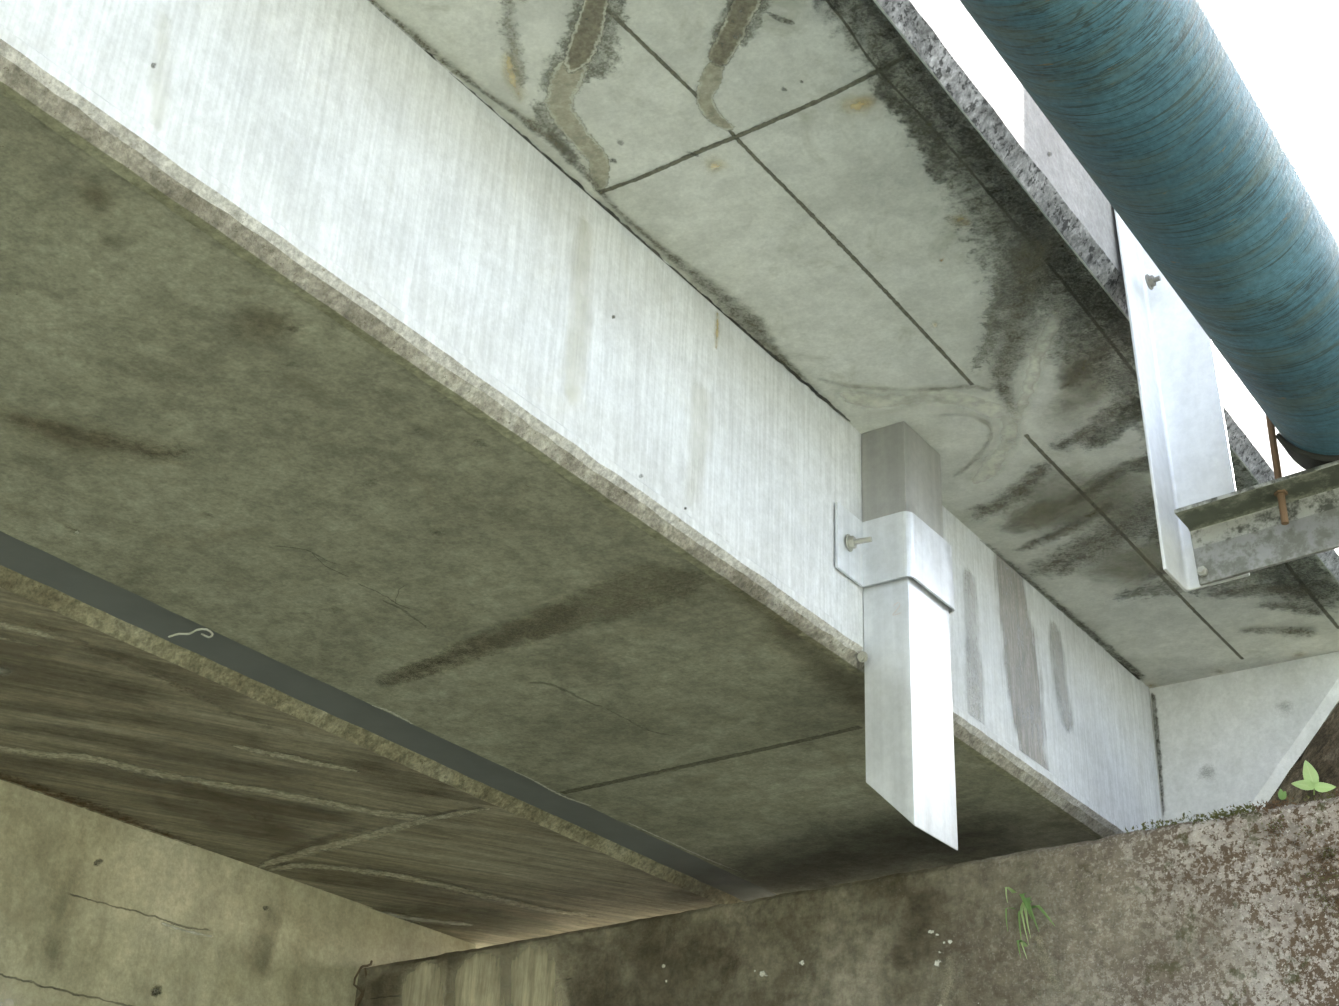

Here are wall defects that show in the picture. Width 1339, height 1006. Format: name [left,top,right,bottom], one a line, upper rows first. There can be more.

leakage [533,0,628,190]
leakage [696,0,795,130]
leakage [814,0,1144,481]
leakage [1229,448,1258,491]
leakage [979,456,1339,770]